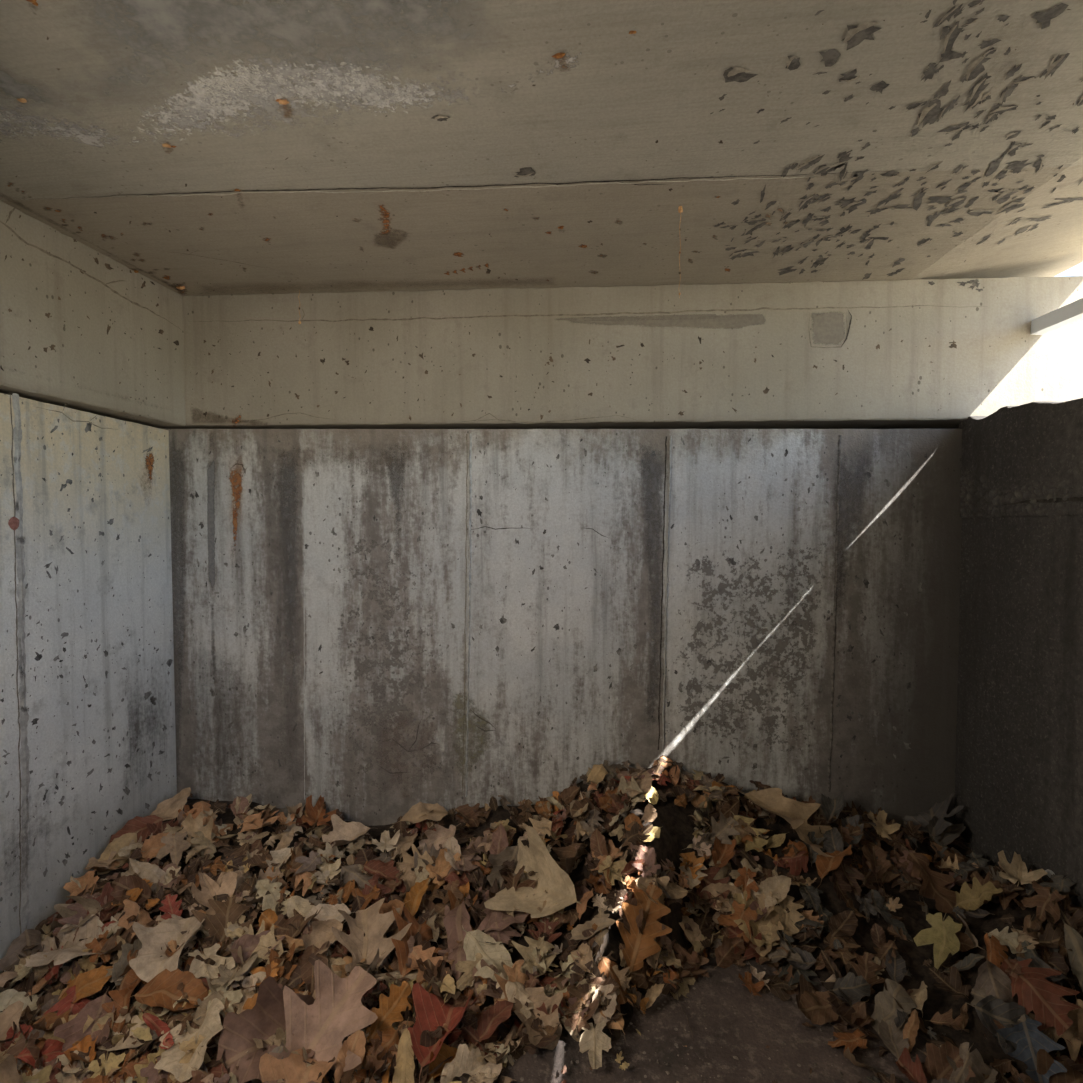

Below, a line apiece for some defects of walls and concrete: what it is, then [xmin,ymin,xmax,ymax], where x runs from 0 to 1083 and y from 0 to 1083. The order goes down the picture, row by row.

damp [95,0,467,143]
peeling [710,67,759,114]
peeling [813,20,890,105]
crack [142,172,849,197]
peeling [714,131,1083,280]
crack [0,207,980,329]
corrosion [8,517,19,531]
corrosion [145,454,154,480]
damp [207,461,215,587]
corrosion [229,469,242,546]
damp [169,444,185,769]
damp [641,452,662,720]